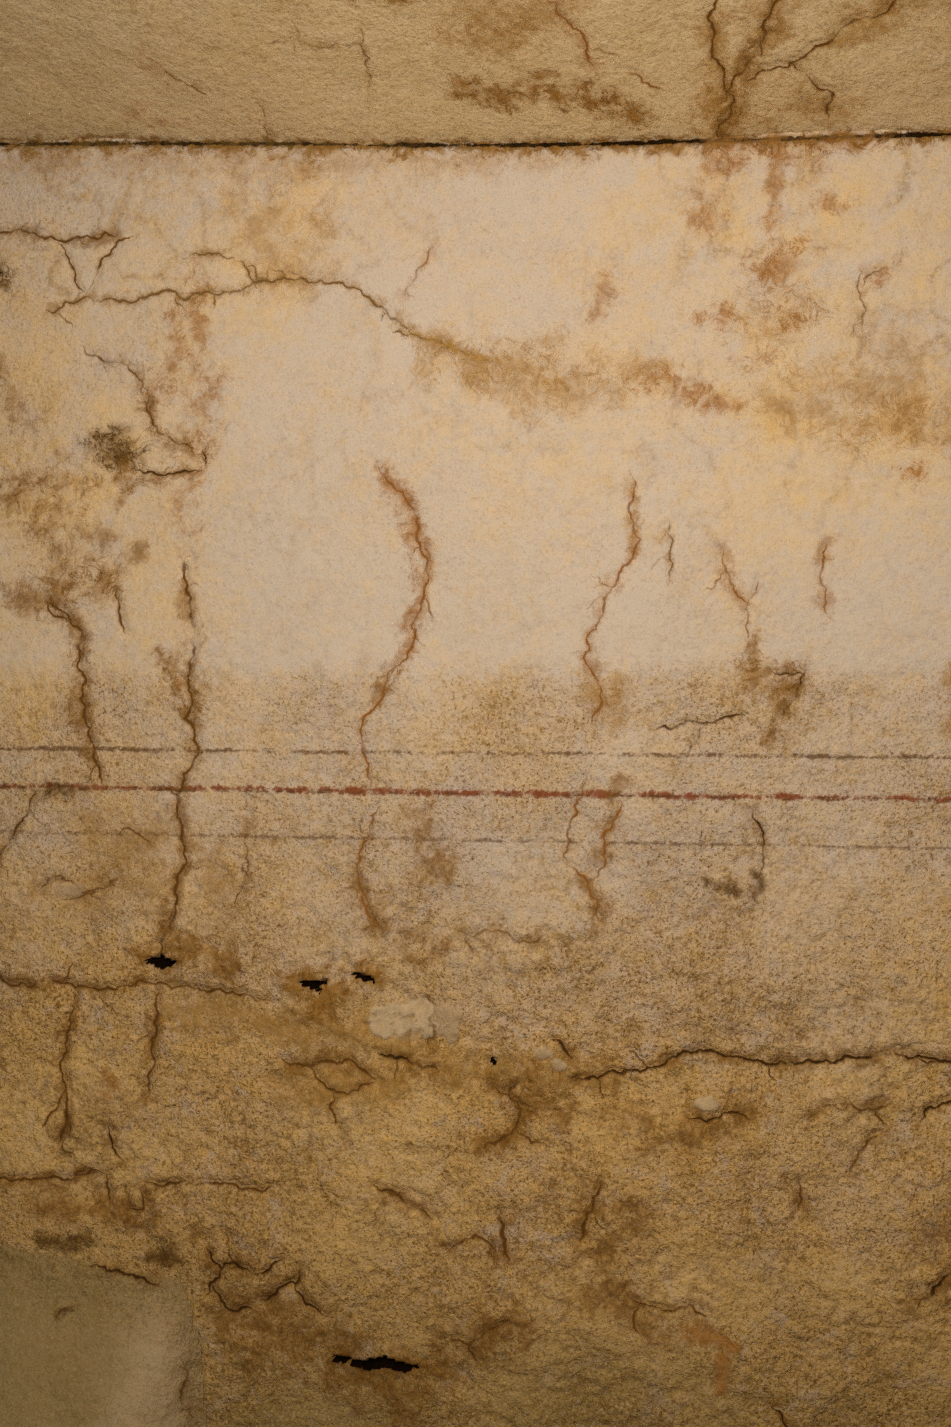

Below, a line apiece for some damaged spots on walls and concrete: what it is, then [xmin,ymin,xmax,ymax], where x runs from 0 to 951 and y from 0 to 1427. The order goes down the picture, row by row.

crack [0,0,951,162]
crack [0,227,485,360]
crack [98,357,207,476]
leakage [7,574,88,650]
crack [583,474,673,723]
crack [357,467,432,926]
crack [652,713,744,733]
crack [0,560,276,1210]
crack [563,790,622,919]
crack [687,1110,748,1123]
crack [552,1039,951,1096]
crack [803,1099,951,1171]